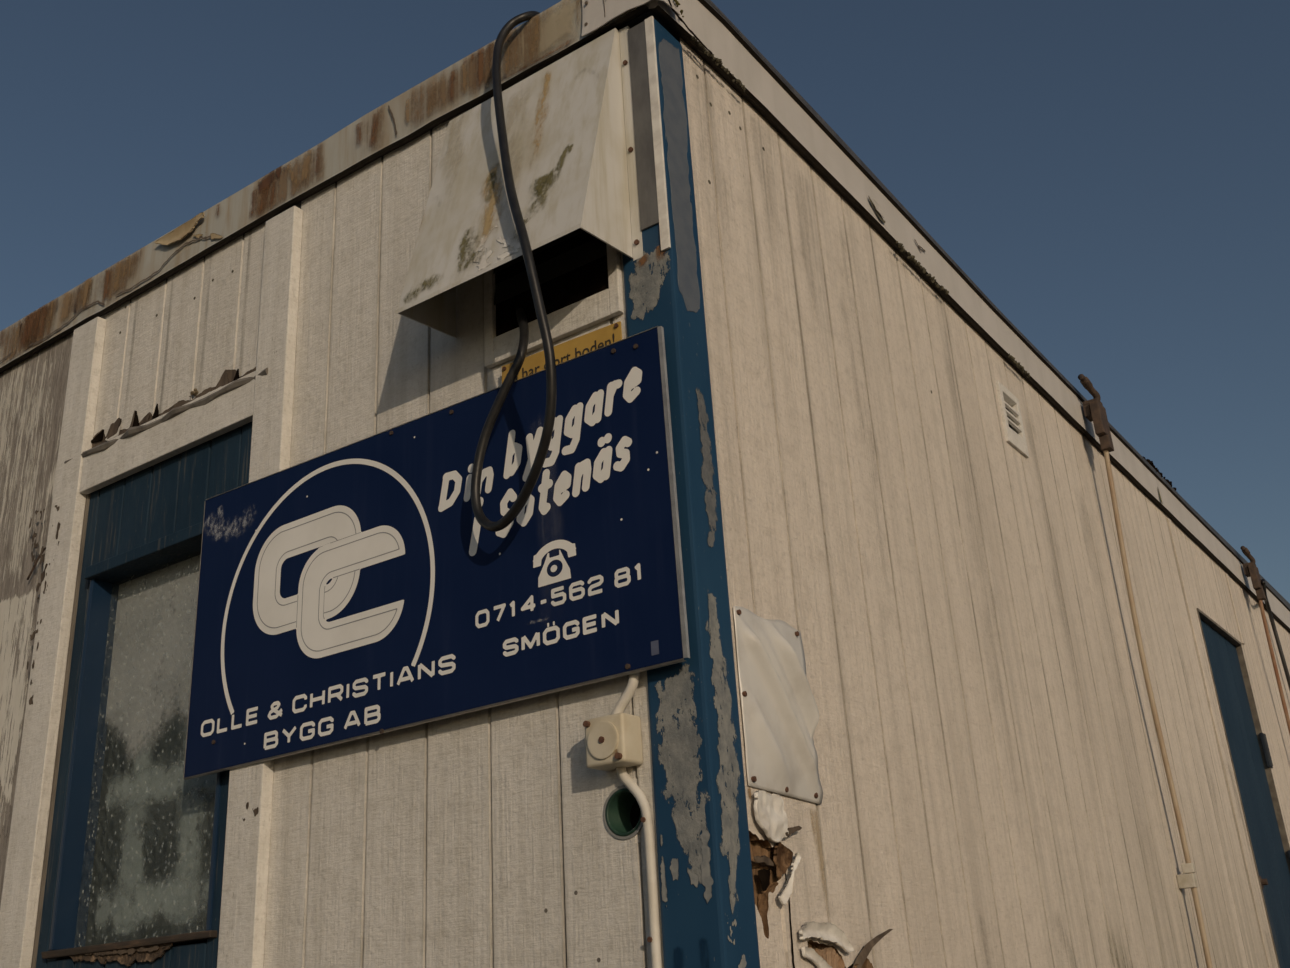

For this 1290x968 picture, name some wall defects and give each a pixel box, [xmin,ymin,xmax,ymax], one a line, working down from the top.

rust [405,15,570,122]
rust [356,107,383,144]
rust [249,146,322,216]
leakage [458,165,500,270]
leakage [517,145,569,236]
rust [0,251,141,361]
peeling [629,247,671,320]
peeling [695,388,718,547]
peeling [655,593,802,968]
peeling [799,921,854,968]